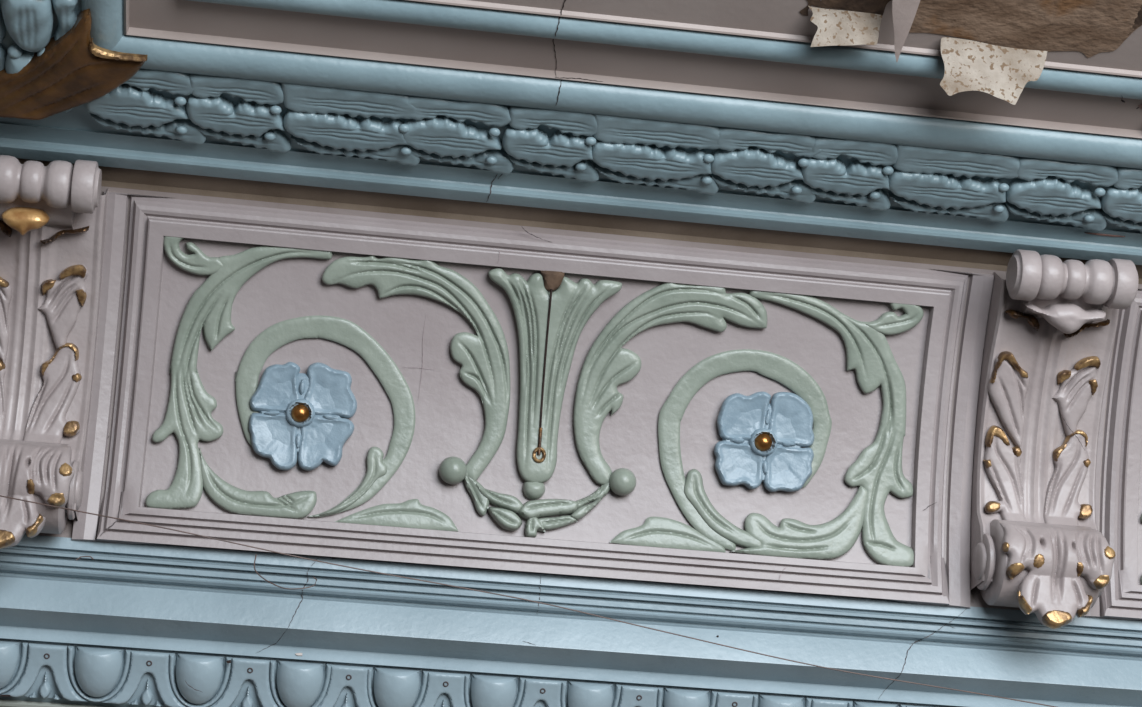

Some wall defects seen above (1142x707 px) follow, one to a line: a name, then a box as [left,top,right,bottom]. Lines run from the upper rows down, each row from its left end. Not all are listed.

crack [553,0,603,105]
flaking render [800,0,1142,105]
crack [259,557,336,652]
crack [882,609,966,694]